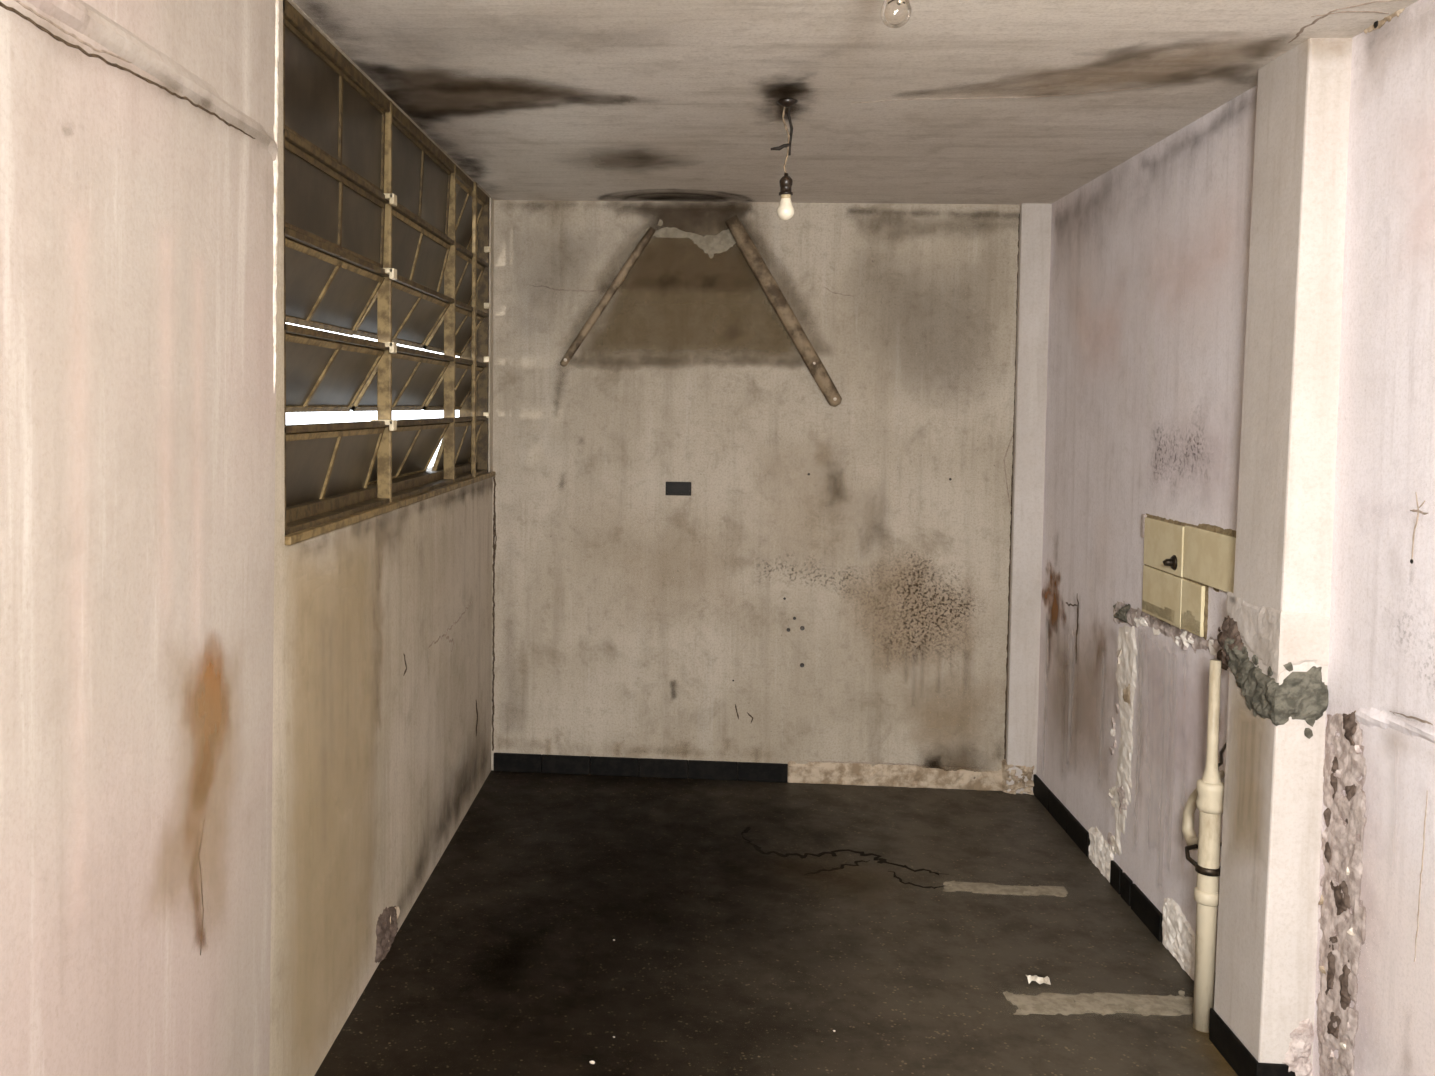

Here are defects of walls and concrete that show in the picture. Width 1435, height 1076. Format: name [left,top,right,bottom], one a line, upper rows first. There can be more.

water stain [372,67,579,118]
water stain [891,572,969,651]
corrosion [1042,569,1065,627]
corrosion [193,653,227,955]
flaking render [788,761,1003,791]
peeling [1088,591,1330,882]
crack [741,827,949,889]
flaking render [1282,711,1367,1076]
flaking render [1162,898,1196,981]